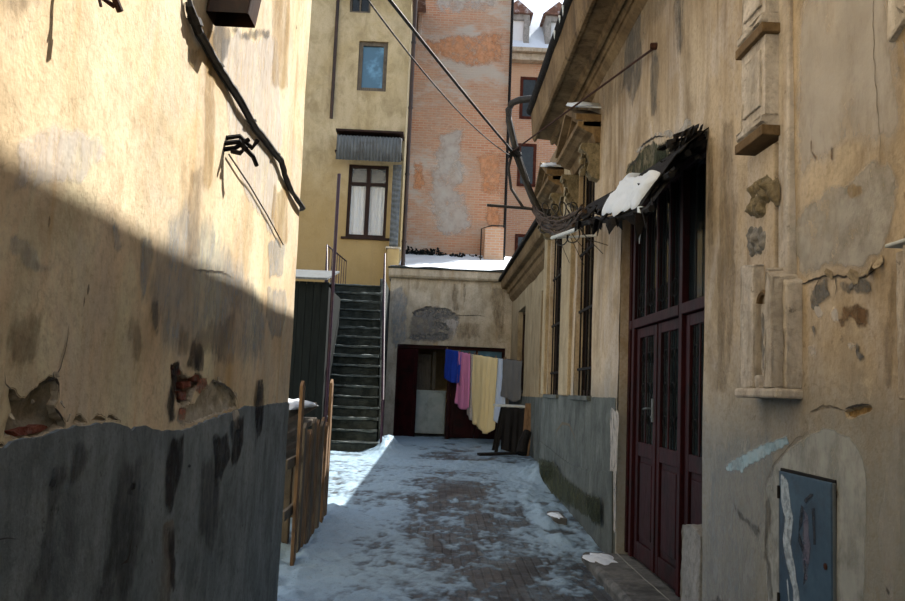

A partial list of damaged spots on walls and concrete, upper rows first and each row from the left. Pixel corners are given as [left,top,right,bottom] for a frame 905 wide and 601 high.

flaking render [810,278,829,310]
flaking render [842,278,871,293]
flaking render [410,306,459,342]
flaking render [841,304,868,327]
flaking render [0,328,121,448]
flaking render [170,361,240,428]
flaking render [810,403,873,420]